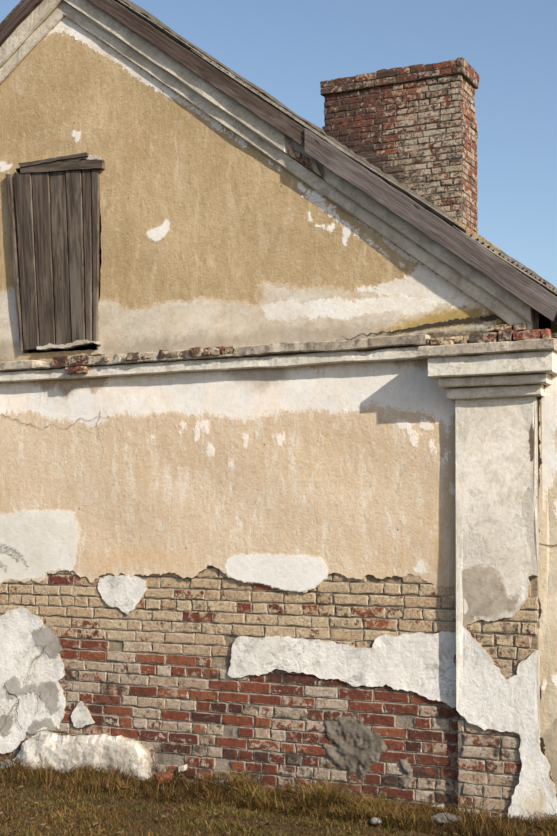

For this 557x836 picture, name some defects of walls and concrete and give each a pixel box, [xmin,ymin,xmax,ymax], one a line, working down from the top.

peeling [38,17,248,148]
peeling [0,286,23,360]
damp [103,324,386,355]
peeling [52,179,557,374]
crack [2,414,107,450]
crack [537,374,552,495]
flaking render [0,360,557,818]
crack [540,734,553,781]